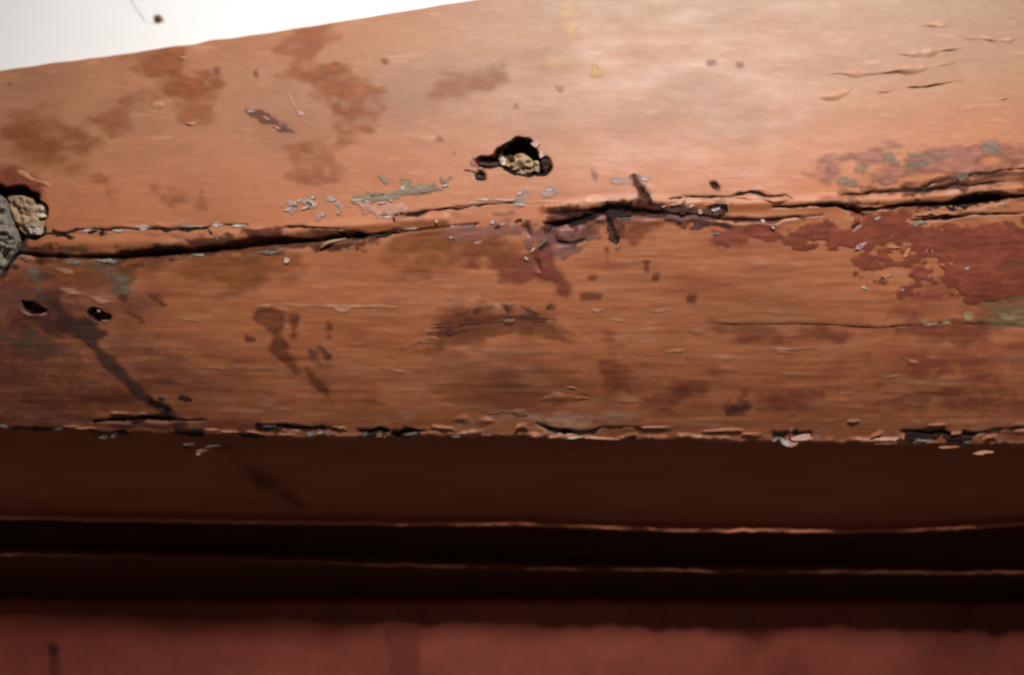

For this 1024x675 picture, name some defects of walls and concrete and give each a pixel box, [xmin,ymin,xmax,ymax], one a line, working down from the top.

leakage [290,30,322,78]
leakage [0,170,41,194]
peeling [280,175,451,221]
crack [19,168,1024,268]
peeling [660,182,727,235]
peeling [761,208,1024,320]
leakage [14,292,185,426]
leakage [254,308,299,368]
peeling [174,422,461,455]
peeling [482,422,689,455]
peeling [703,426,812,447]
peeling [870,423,997,455]